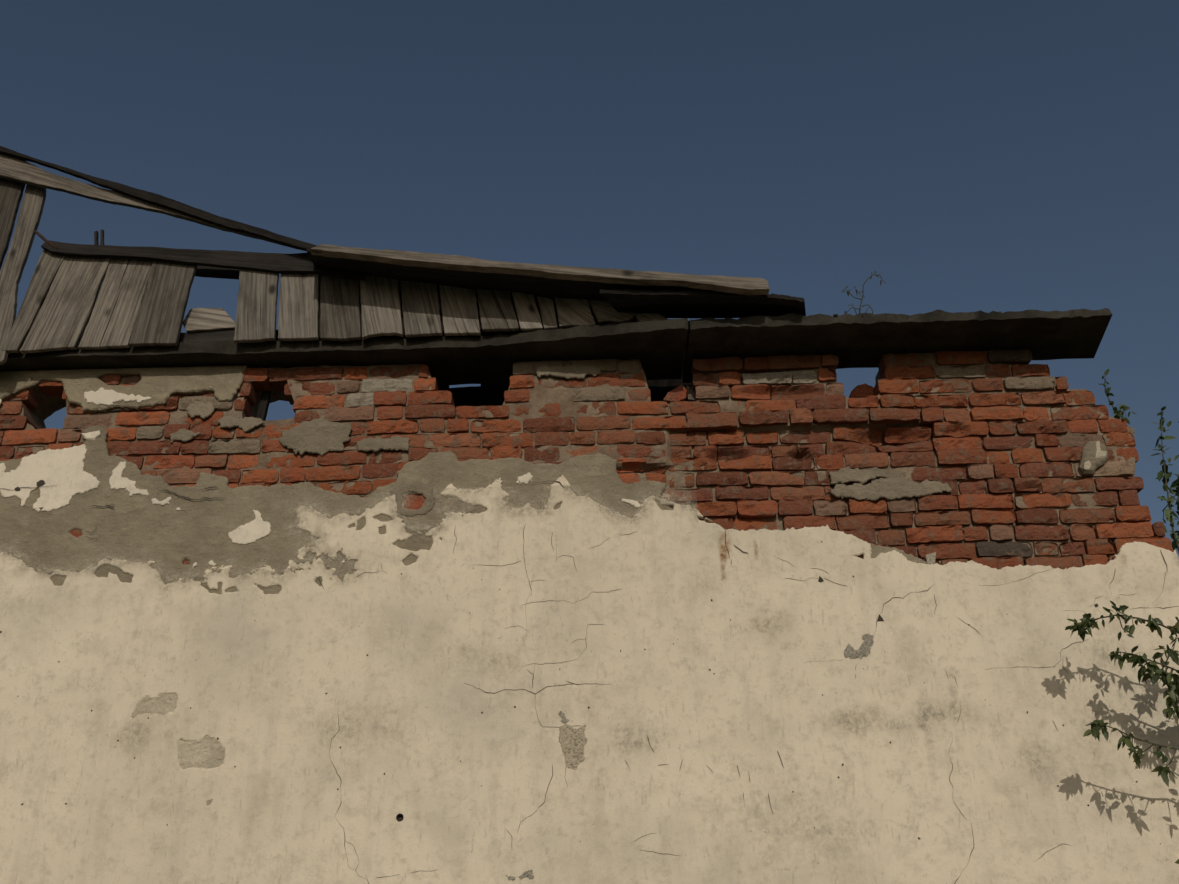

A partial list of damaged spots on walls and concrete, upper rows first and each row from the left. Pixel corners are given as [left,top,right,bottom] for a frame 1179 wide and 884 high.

peeling [0,365,247,413]
peeling [0,438,673,594]
peeling [870,543,940,565]
crack [465,524,638,727]
crack [876,586,937,626]
flaking render [844,634,874,669]
flaking render [132,693,191,719]
flaking render [178,736,236,769]
flaking render [559,711,587,770]
crack [329,703,435,884]
crack [506,765,568,844]